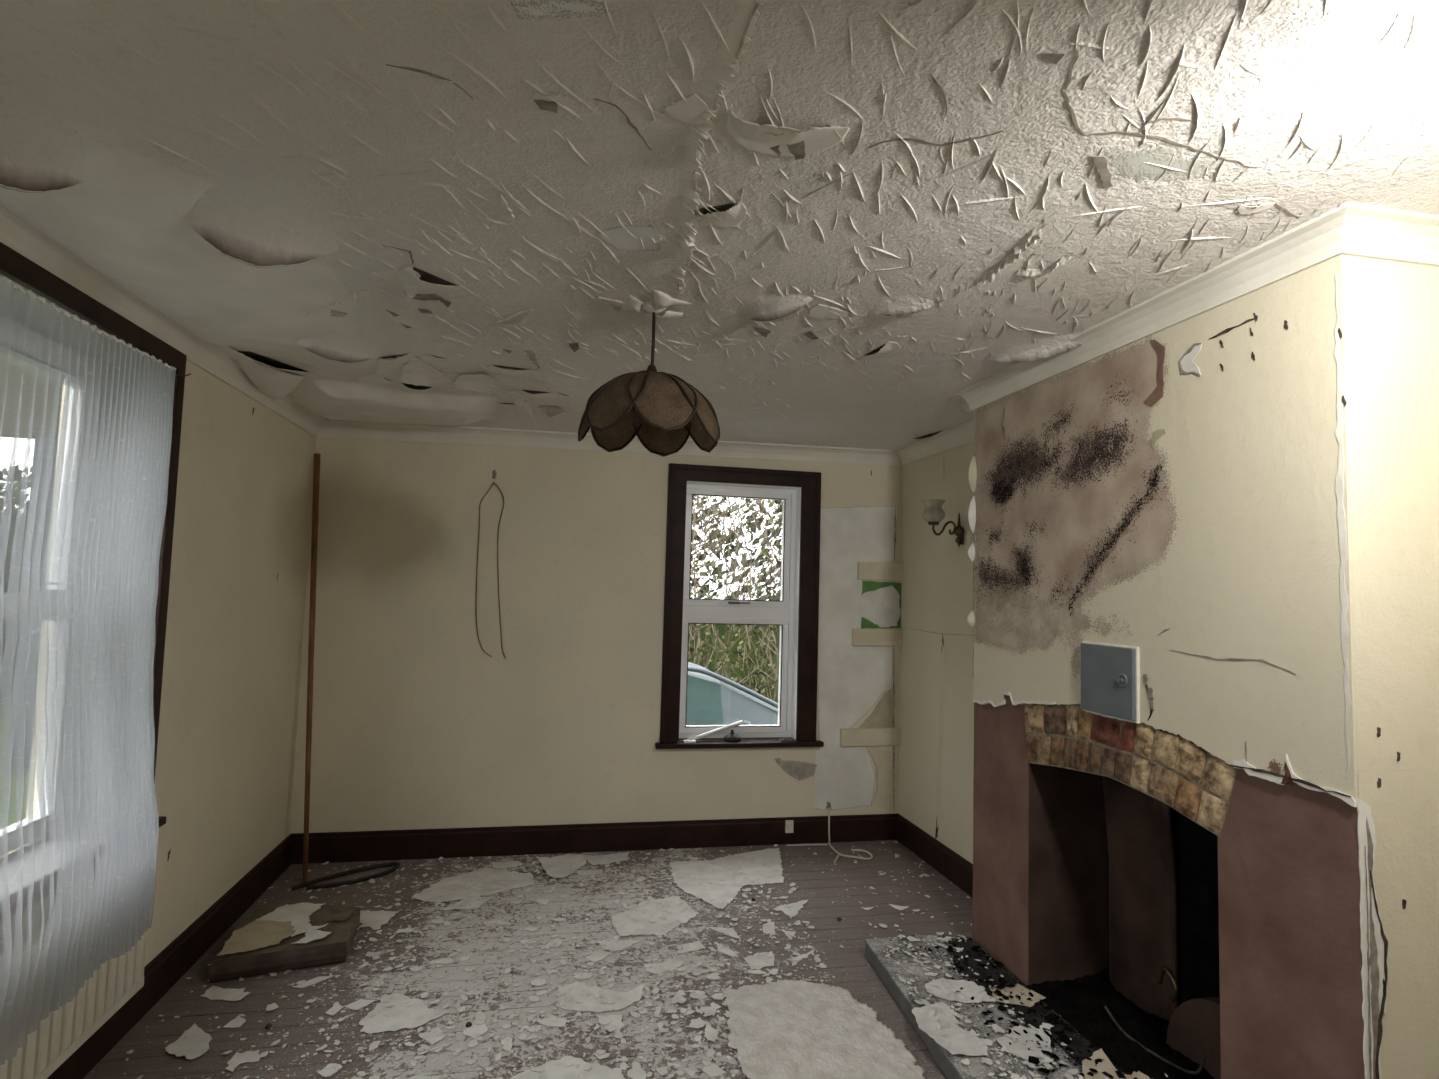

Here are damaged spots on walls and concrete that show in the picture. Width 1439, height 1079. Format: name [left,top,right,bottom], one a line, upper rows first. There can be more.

crack [594,98,651,150]
peeling [770,140,805,160]
crack [869,74,1003,148]
crack [1064,50,1259,168]
crack [1275,203,1300,218]
peeling [404,292,451,314]
peeling [1179,343,1202,376]
leakage [973,336,1181,680]
flaking render [814,506,898,811]
flaking render [1226,275,1388,1079]